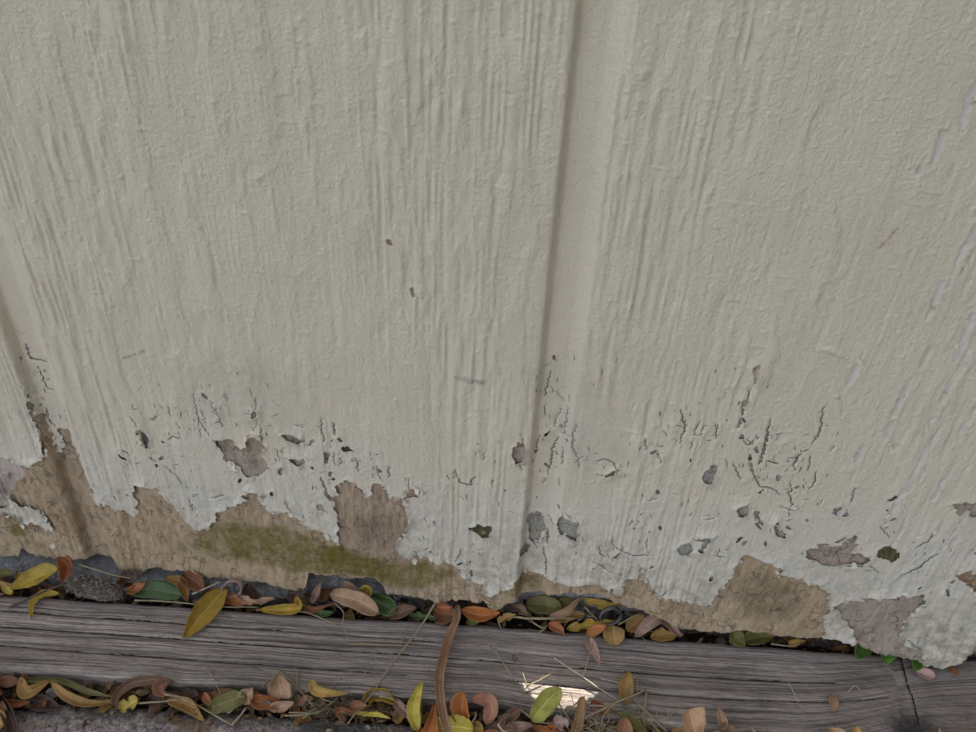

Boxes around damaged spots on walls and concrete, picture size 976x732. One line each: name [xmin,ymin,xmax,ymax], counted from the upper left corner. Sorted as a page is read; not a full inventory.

peeling [0,395,926,663]
crack [446,364,839,597]
peeling [946,569,976,596]
peeling [949,502,976,520]